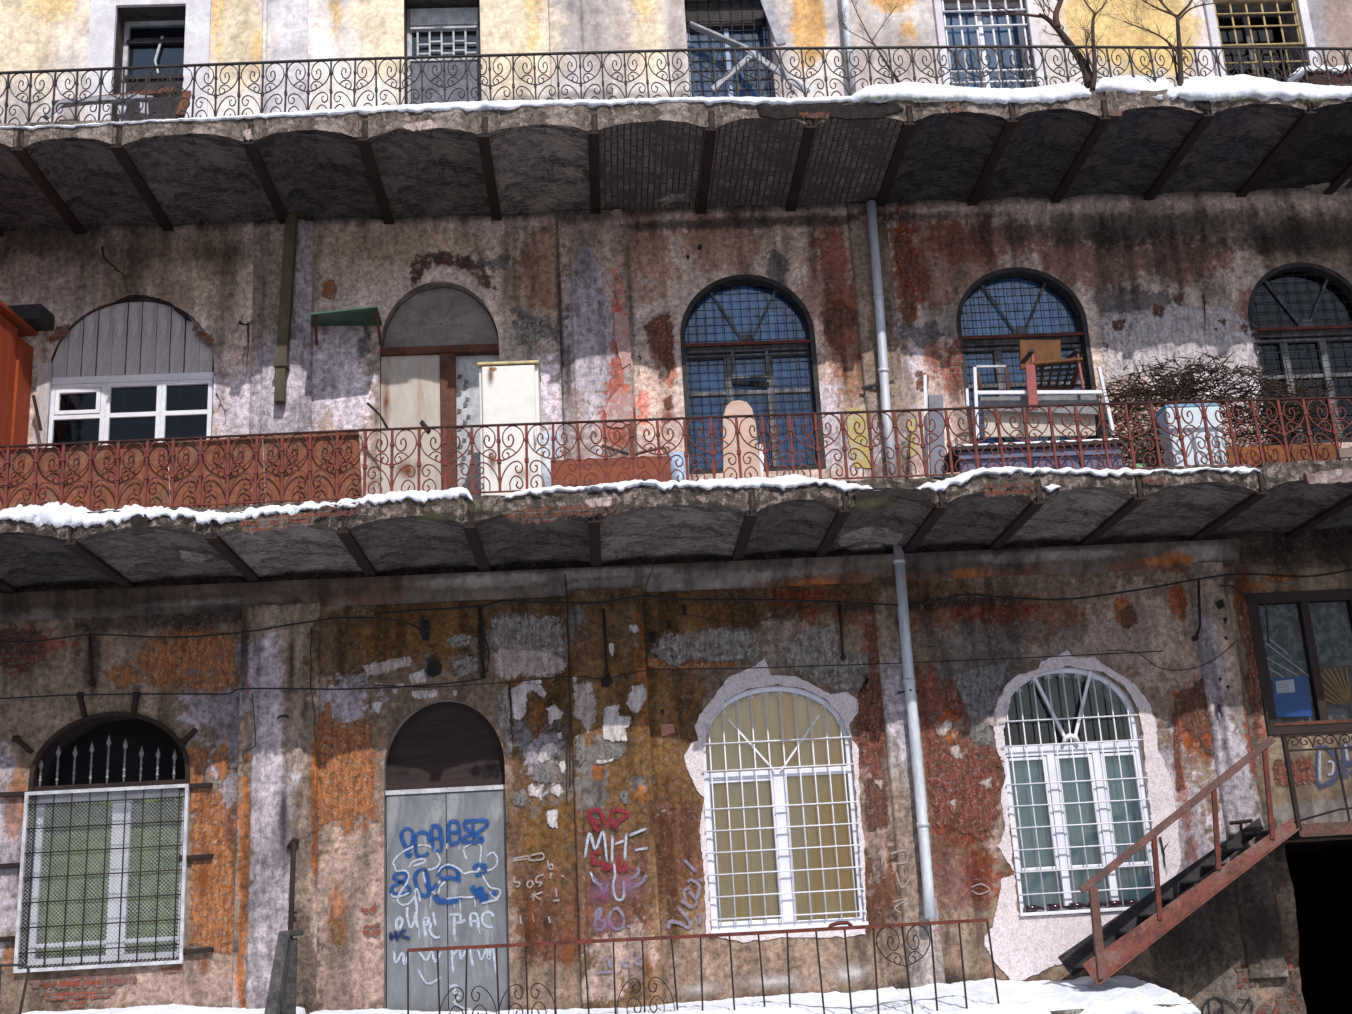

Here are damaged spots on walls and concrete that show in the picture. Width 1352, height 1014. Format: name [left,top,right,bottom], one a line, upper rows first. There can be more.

flaking render [406,250,497,290]
peeling [102,629,239,693]
peeling [317,612,647,835]
peeling [629,604,890,943]
peeling [927,577,1293,981]
flaking render [361,902,381,937]
flaking render [1248,992,1301,1014]